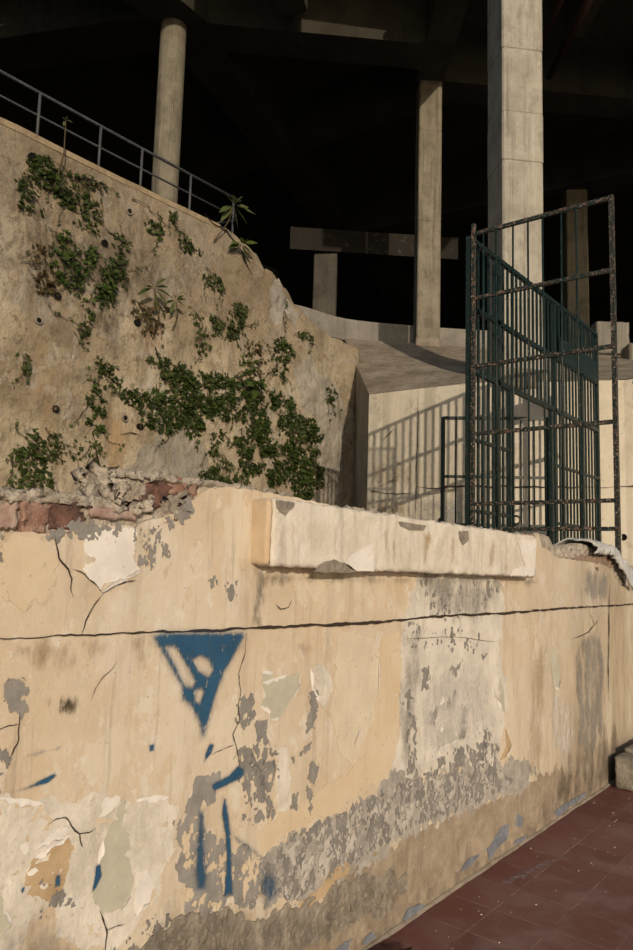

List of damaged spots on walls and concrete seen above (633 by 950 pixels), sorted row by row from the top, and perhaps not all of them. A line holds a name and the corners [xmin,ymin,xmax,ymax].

peeling [0,499,195,612]
spalling [399,521,426,530]
spalling [459,531,469,545]
peeling [0,539,586,950]
crack [0,537,633,765]
leakage [577,638,616,781]